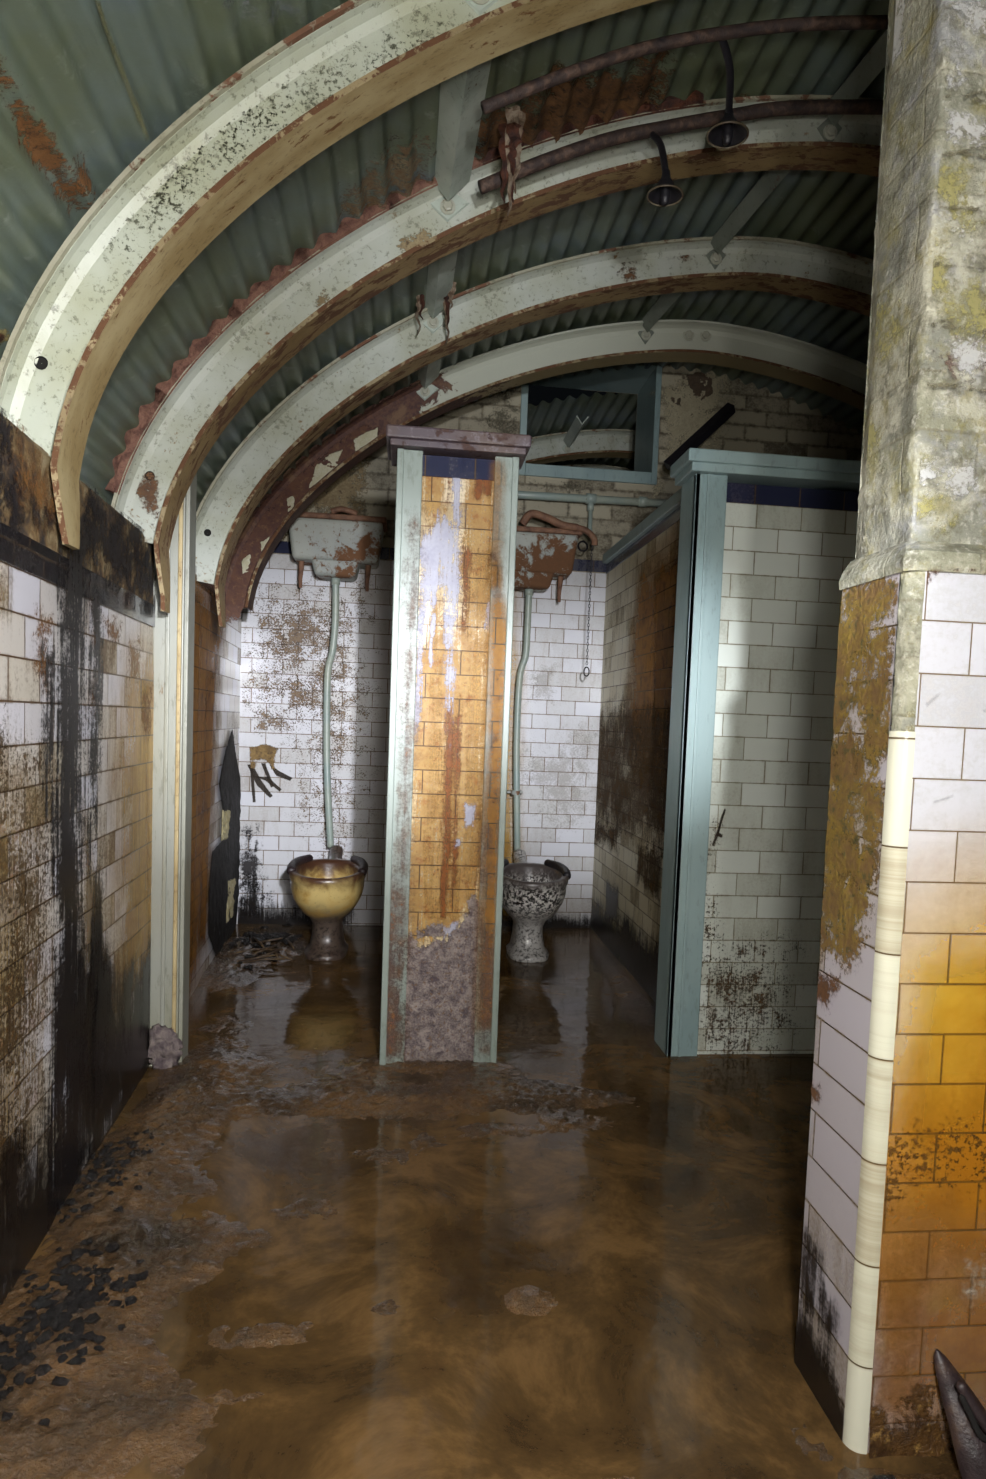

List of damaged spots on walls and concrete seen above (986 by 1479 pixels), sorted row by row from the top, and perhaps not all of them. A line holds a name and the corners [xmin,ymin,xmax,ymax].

corrosion [0,60,95,213]
corrosion [474,50,677,217]
corrosion [136,472,161,518]
damp [0,407,156,1306]
damp [242,576,379,859]
corrosion [386,472,507,1059]
peeling [455,803,475,846]
spalling [404,894,479,1062]
damp [882,912,986,1234]